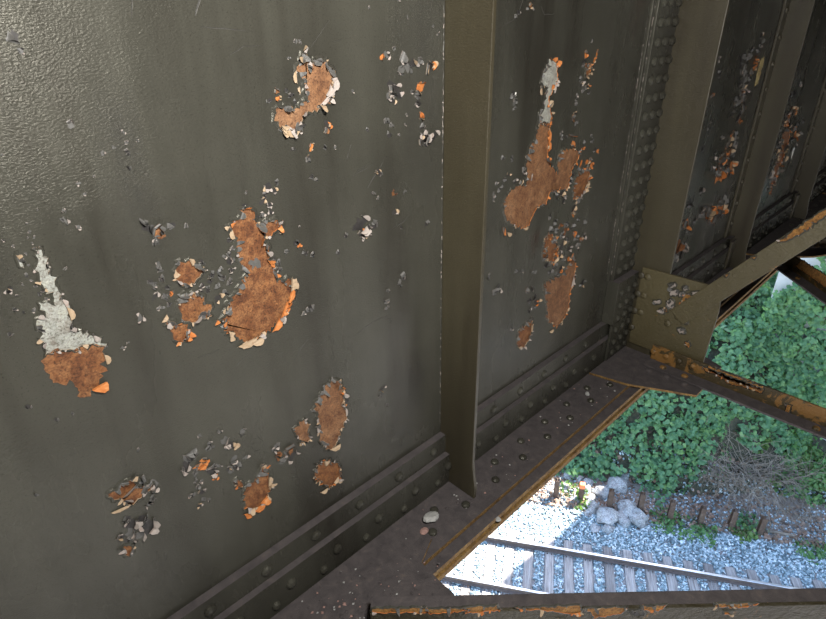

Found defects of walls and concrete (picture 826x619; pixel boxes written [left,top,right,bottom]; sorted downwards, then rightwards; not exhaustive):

peeling [266,39,340,151]
spalling [380,46,441,147]
spalling [711,32,765,183]
peeling [492,38,600,350]
peeling [1,222,112,398]
peeling [147,178,315,349]
corrosion [701,365,765,394]
peeling [181,377,349,519]
peeling [104,475,161,558]
corrosion [370,603,502,617]
corrosion [514,603,629,619]
corrosion [713,601,761,617]